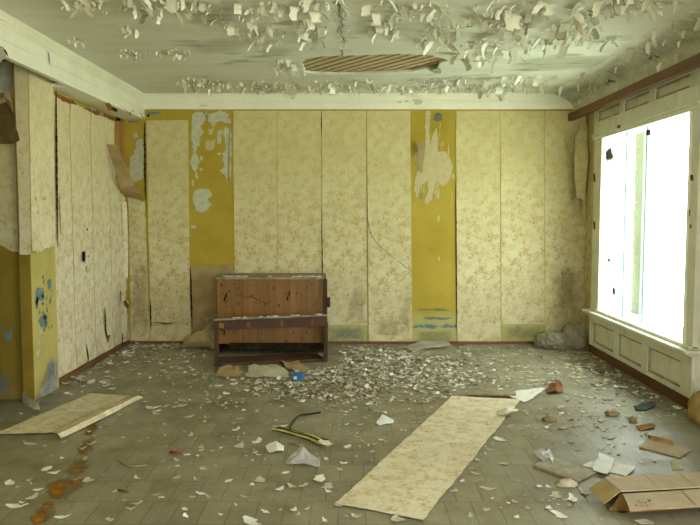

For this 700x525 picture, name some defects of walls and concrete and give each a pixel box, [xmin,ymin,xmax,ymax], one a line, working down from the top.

crack [332,0,345,56]
flaking render [0,46,13,94]
flaking render [60,0,700,212]
peeling [35,275,53,356]
spalling [37,358,58,397]